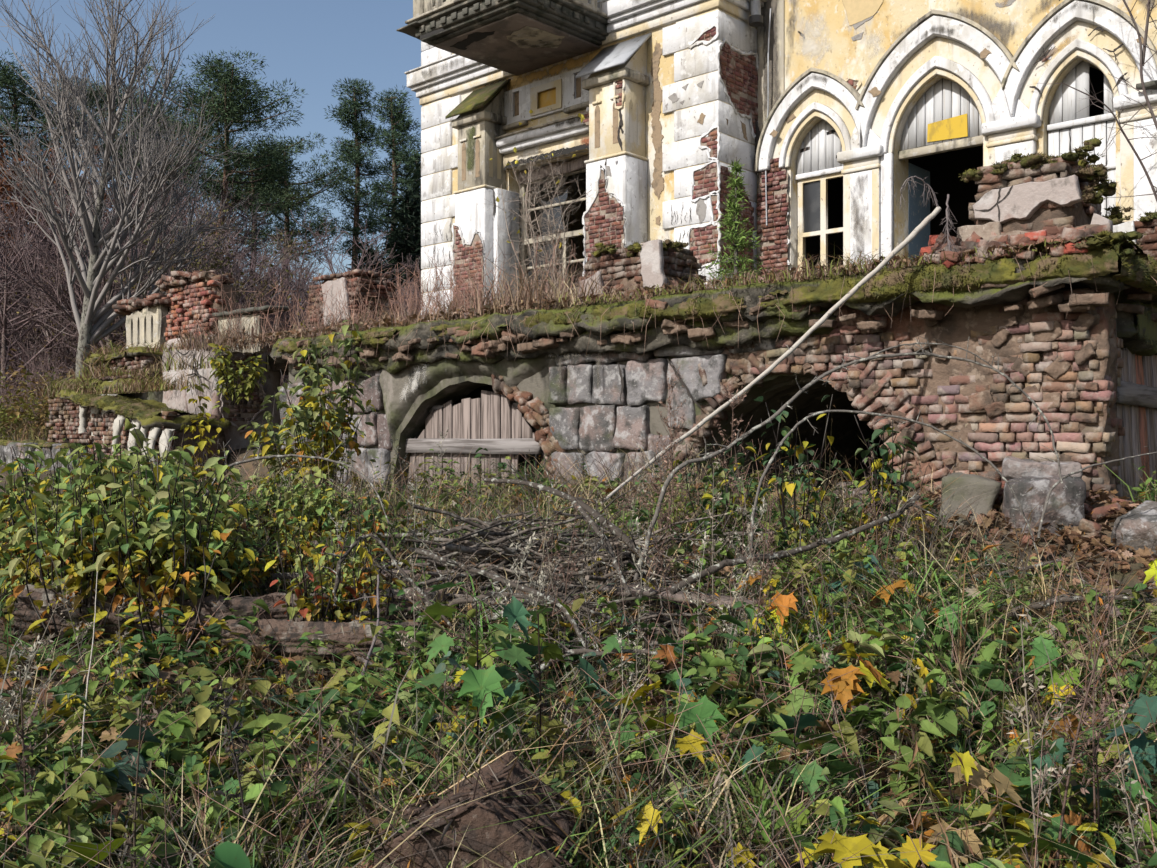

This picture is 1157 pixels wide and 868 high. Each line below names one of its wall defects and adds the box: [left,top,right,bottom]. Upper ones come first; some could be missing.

flaking render [451,223,486,314]
flaking render [582,164,627,276]
flaking render [651,40,704,200]
flaking render [686,21,790,281]
flaking render [750,289,1125,499]